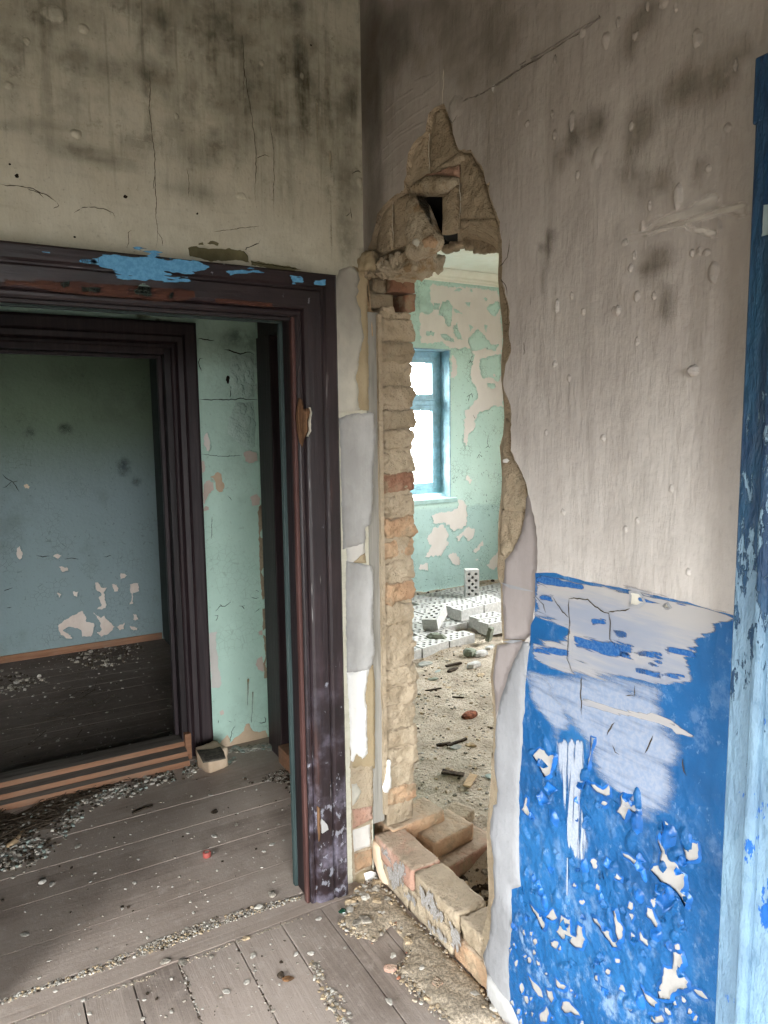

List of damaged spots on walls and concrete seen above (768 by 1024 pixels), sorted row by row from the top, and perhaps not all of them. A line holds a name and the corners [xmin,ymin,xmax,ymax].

crack [442,15,601,123]
crack [149,88,163,245]
crack [215,36,301,270]
peeling [4,240,326,301]
peeling [201,431,226,512]
peeling [56,572,140,640]
peeling [336,109,733,1024]
crack [536,597,630,715]